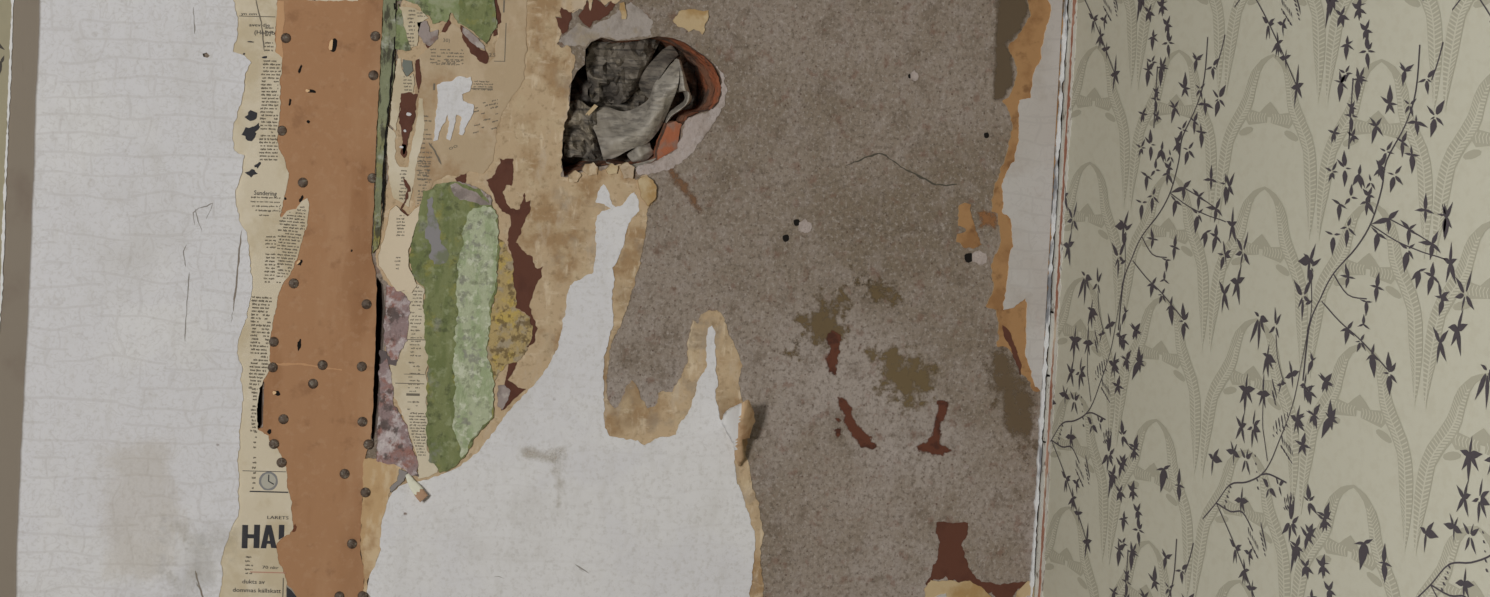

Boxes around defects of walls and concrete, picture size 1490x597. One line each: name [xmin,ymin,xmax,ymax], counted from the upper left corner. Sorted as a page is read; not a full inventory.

peeling [395,0,501,93]
spalling [559,0,727,176]
spalling [798,219,812,233]
spalling [972,250,987,265]
peeling [376,174,533,492]